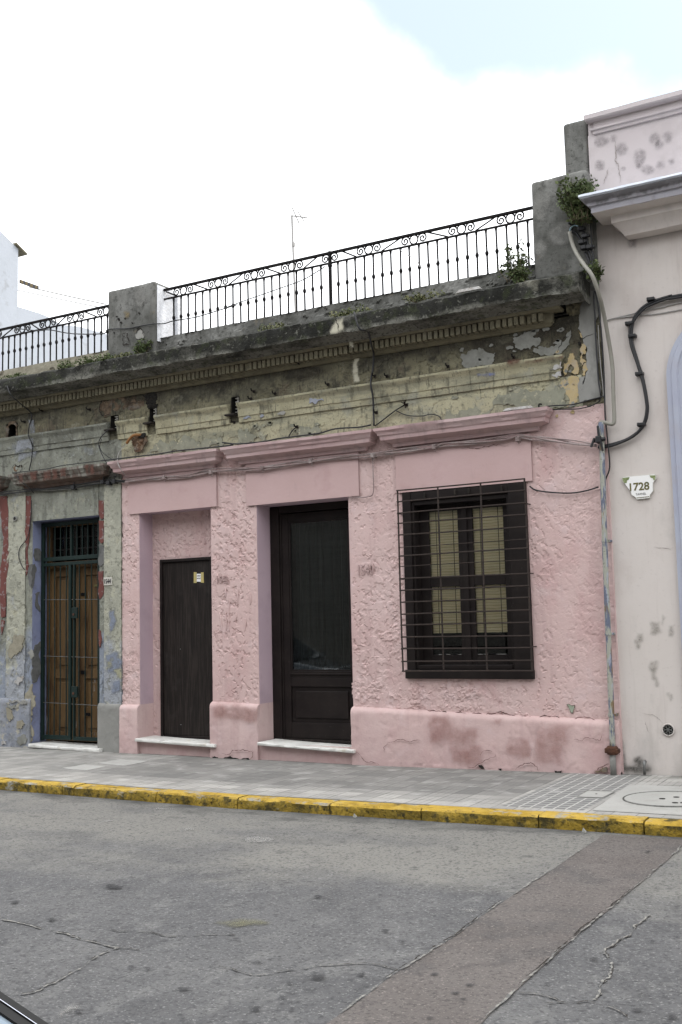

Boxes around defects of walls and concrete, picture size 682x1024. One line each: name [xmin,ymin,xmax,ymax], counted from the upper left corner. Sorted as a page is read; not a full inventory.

peeling [445,327,588,419]
peeling [0,496,41,746]